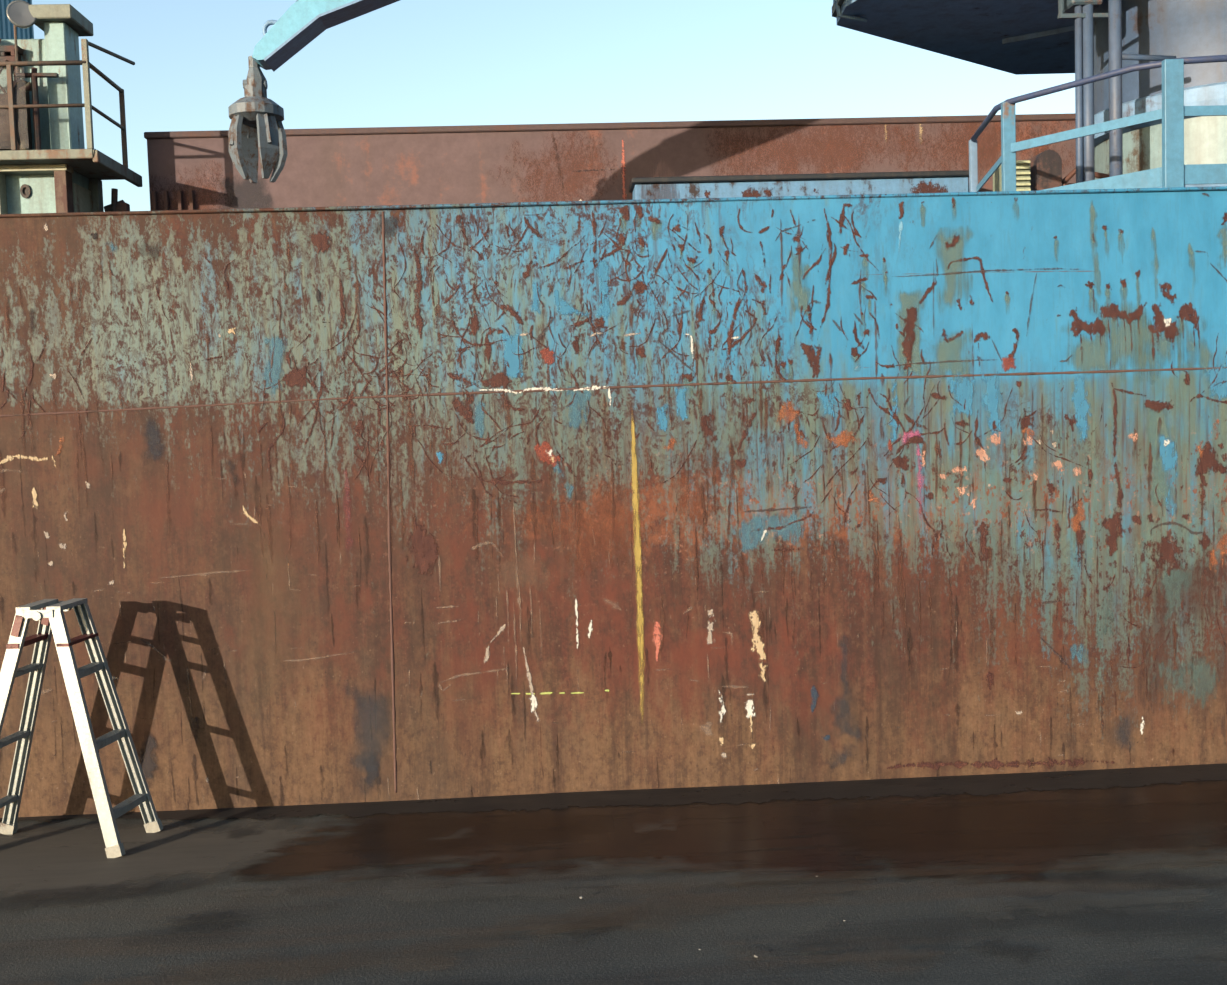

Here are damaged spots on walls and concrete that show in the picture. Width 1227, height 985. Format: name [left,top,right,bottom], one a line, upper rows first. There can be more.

rust [413,250,442,339]
rust [447,304,523,446]
rust [617,280,646,365]
rust [663,219,860,581]
rust [829,233,1043,631]
peeling [940,466,975,508]
peeling [976,433,1001,462]
peeling [1024,430,1081,476]
rust [1033,400,1188,627]
rust [1068,270,1210,385]
rust [1182,419,1227,602]
peeling [749,611,766,682]